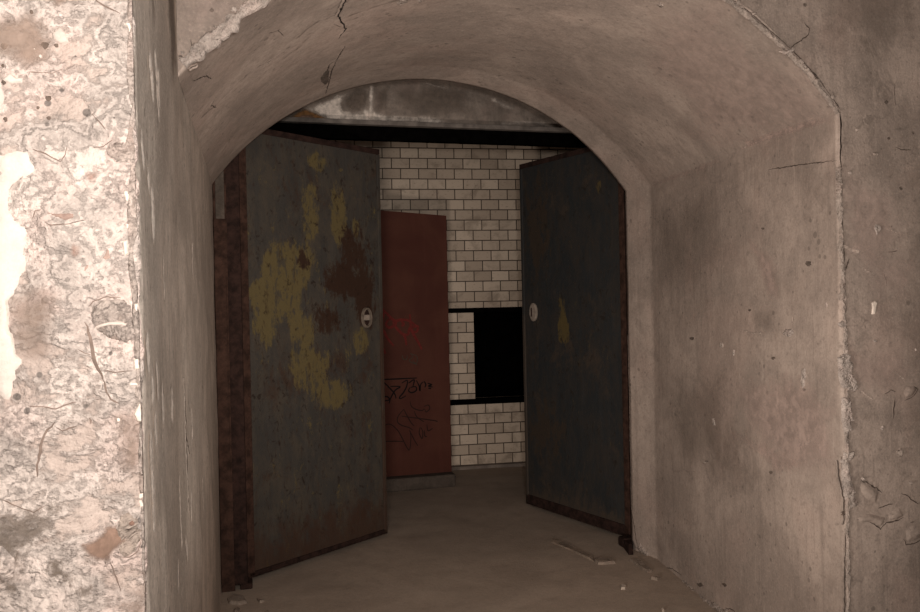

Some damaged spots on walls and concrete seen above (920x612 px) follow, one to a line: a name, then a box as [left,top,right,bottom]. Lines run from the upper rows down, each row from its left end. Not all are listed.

flaking render [0,64,23,106]
flaking render [34,27,68,59]
spalling [179,0,271,69]
crack [323,0,348,95]
spalling [722,0,841,114]
spalling [32,209,85,226]
flaking render [0,151,34,399]
spalling [835,168,872,612]